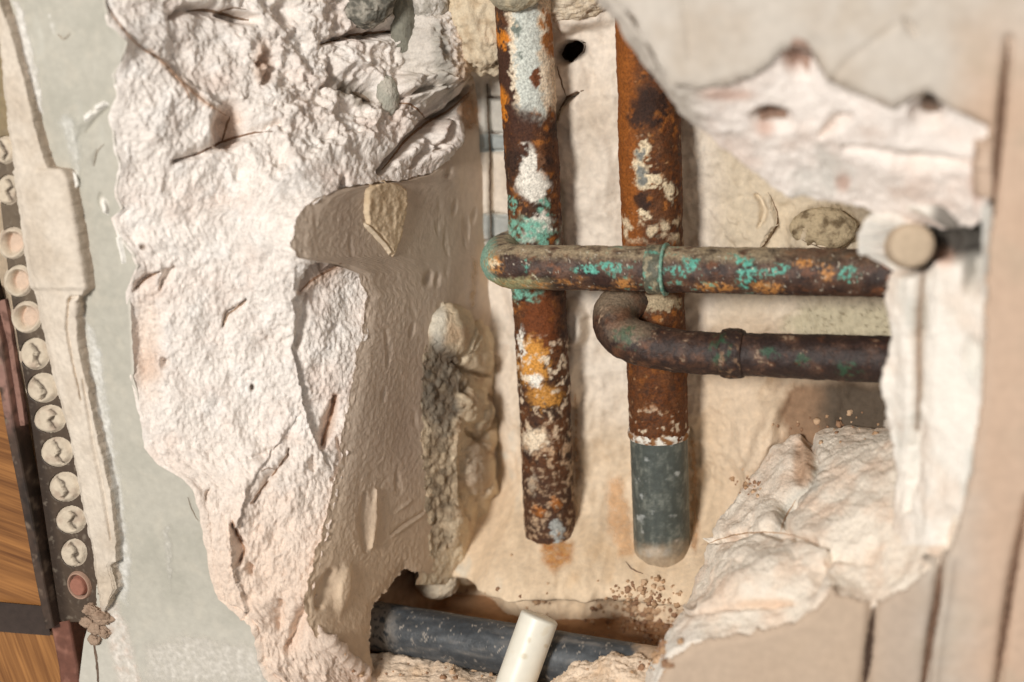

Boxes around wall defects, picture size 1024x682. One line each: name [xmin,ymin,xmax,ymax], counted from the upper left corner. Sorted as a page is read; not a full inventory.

crack [108,6,272,160]
spalling [105,0,499,682]
crack [321,398,337,446]
spalling [550,0,993,682]